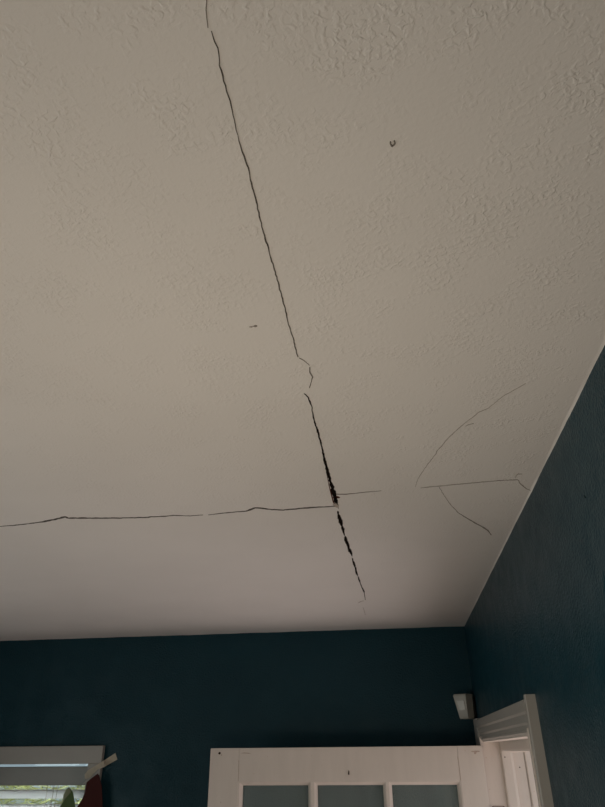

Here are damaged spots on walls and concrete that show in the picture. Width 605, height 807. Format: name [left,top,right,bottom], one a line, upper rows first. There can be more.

crack [0,0,377,613]
crack [415,383,531,535]